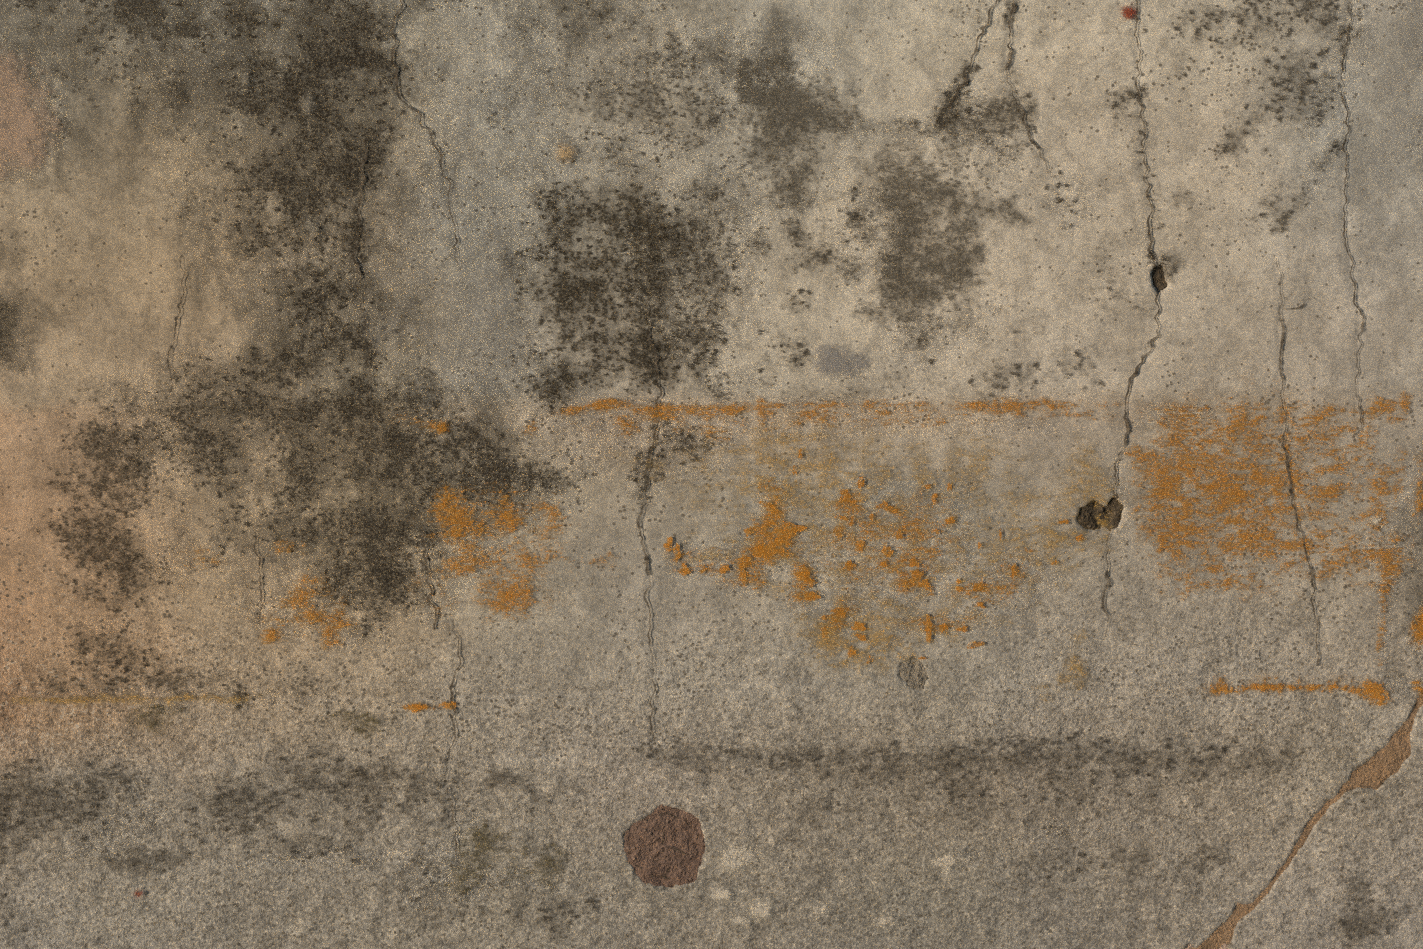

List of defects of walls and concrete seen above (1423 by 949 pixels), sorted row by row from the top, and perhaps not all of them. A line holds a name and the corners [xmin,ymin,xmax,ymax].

water stain [1174,0,1362,155]
water stain [10,0,574,710]
water stain [493,32,1117,672]
rust [556,395,1119,441]
rust [663,476,1057,664]
spalling [1077,497,1124,532]
crack [1113,0,1160,499]
rust [1122,392,1423,706]
crack [1276,263,1320,666]
spalling [624,804,705,888]
flaking render [731,897,771,926]
crack [1185,695,1423,949]